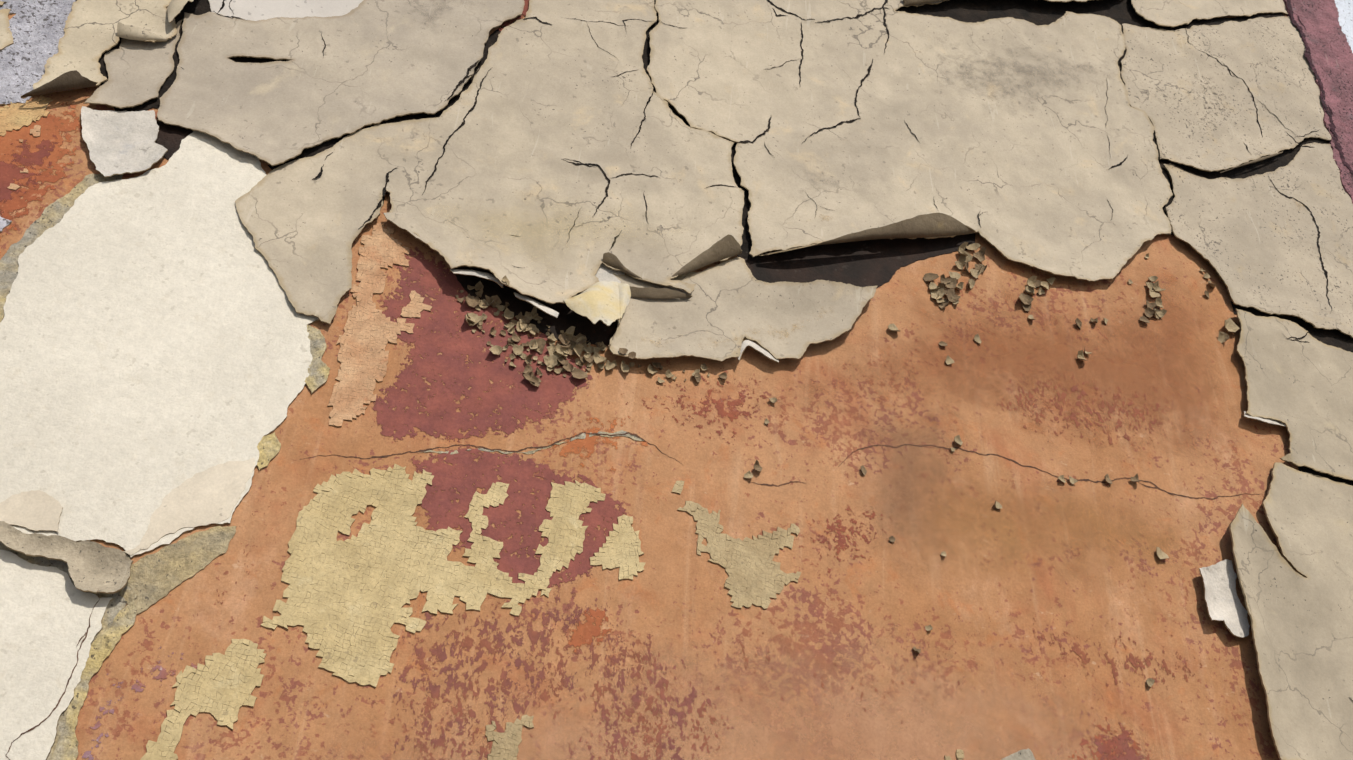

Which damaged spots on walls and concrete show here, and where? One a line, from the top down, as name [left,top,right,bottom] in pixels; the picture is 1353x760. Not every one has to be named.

corrosion [0,102,82,241]
crack [150,0,245,109]
crack [268,0,772,260]
peeling [235,0,1353,427]
crack [764,0,889,143]
crack [1186,0,1353,343]
flaking render [0,0,525,760]
corrosion [548,415,629,468]
peeling [1225,309,1353,481]
peeling [261,464,645,688]
corrosion [567,607,611,653]
peeling [1199,462,1353,760]